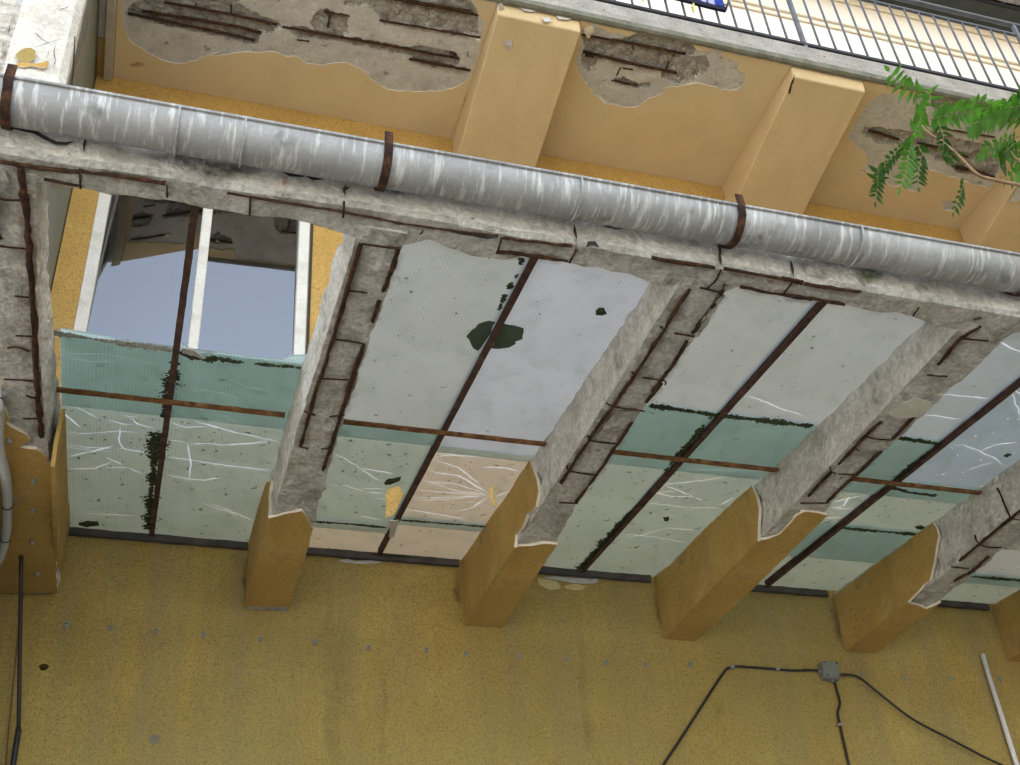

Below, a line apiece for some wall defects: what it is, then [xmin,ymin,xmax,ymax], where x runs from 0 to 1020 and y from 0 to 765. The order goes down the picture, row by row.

spalling [116,0,484,92]
peeling [521,8,571,22]
spalling [575,23,745,107]
spalling [847,93,1014,191]
rust [559,256,862,504]
rust [927,317,989,377]
spalling [596,411,633,443]
rust [800,417,916,504]